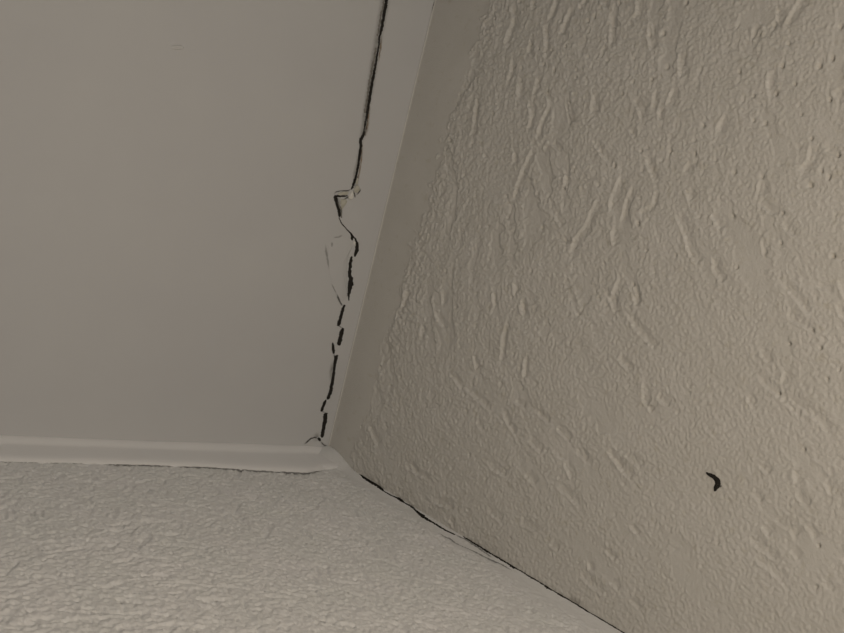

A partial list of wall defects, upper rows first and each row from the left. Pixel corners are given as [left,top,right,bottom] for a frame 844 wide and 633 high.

crack [306,0,388,446]
crack [361,475,624,633]